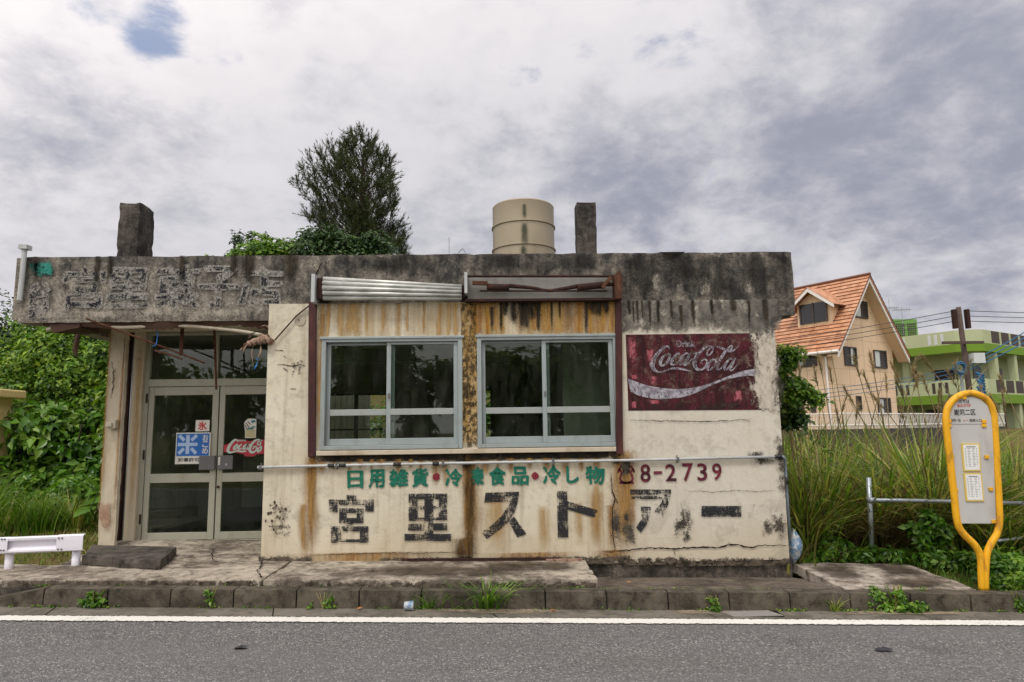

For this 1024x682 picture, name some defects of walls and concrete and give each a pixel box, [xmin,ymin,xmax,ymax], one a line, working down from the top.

leakage [94,256,113,286]
leakage [230,255,254,282]
leakage [483,204,530,269]
rust [519,302,615,334]
leakage [560,253,595,267]
leakage [622,252,789,337]
rust [317,303,367,421]
rust [423,302,504,443]
rust [300,457,335,547]
rust [463,458,513,538]
rust [576,451,633,541]
crack [603,478,786,554]